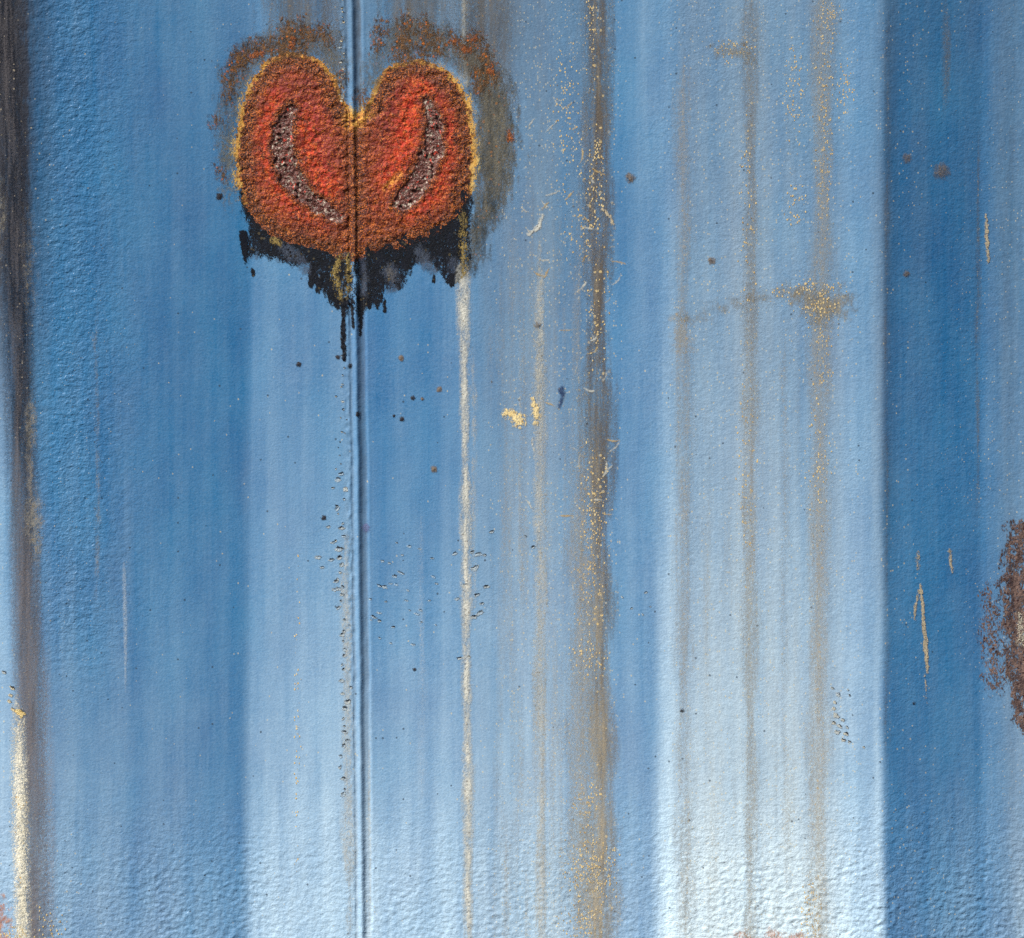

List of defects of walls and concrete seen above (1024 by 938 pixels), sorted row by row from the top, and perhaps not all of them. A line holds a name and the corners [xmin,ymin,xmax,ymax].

rust [207,8,500,263]
rust [548,0,620,938]
rust [978,519,1024,735]